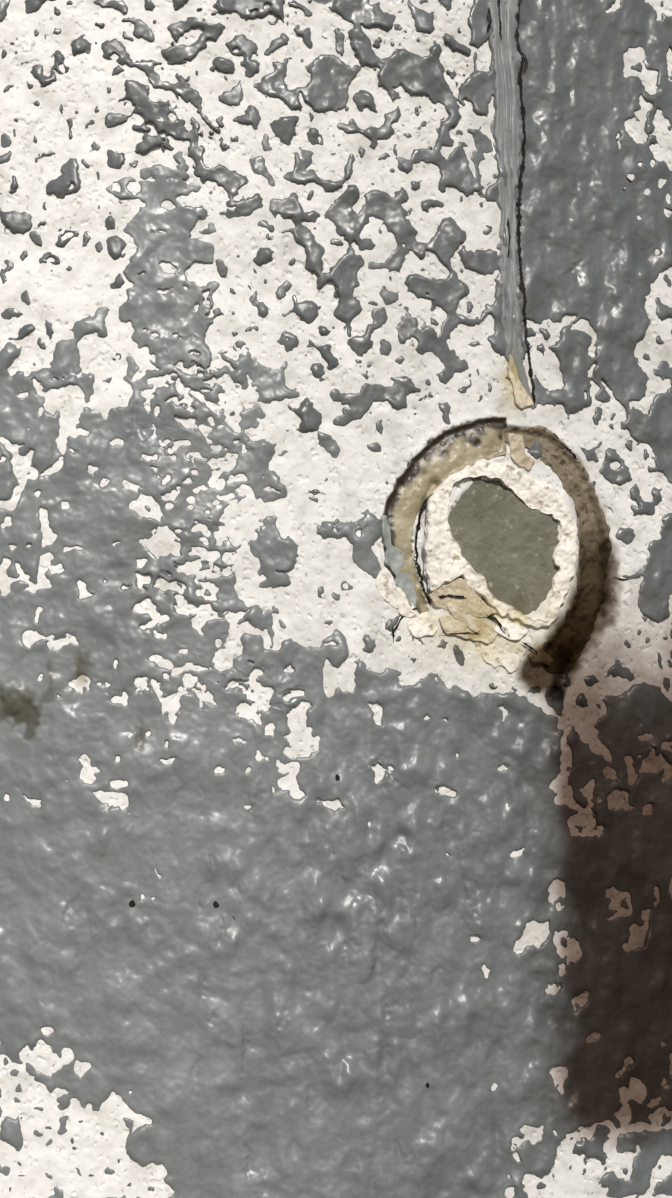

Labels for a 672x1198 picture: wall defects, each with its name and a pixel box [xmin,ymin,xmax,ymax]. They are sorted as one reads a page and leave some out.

peeling [0,0,672,813]
peeling [513,878,569,995]
peeling [0,1027,175,1198]
peeling [549,1067,568,1094]
peeling [505,1121,672,1198]